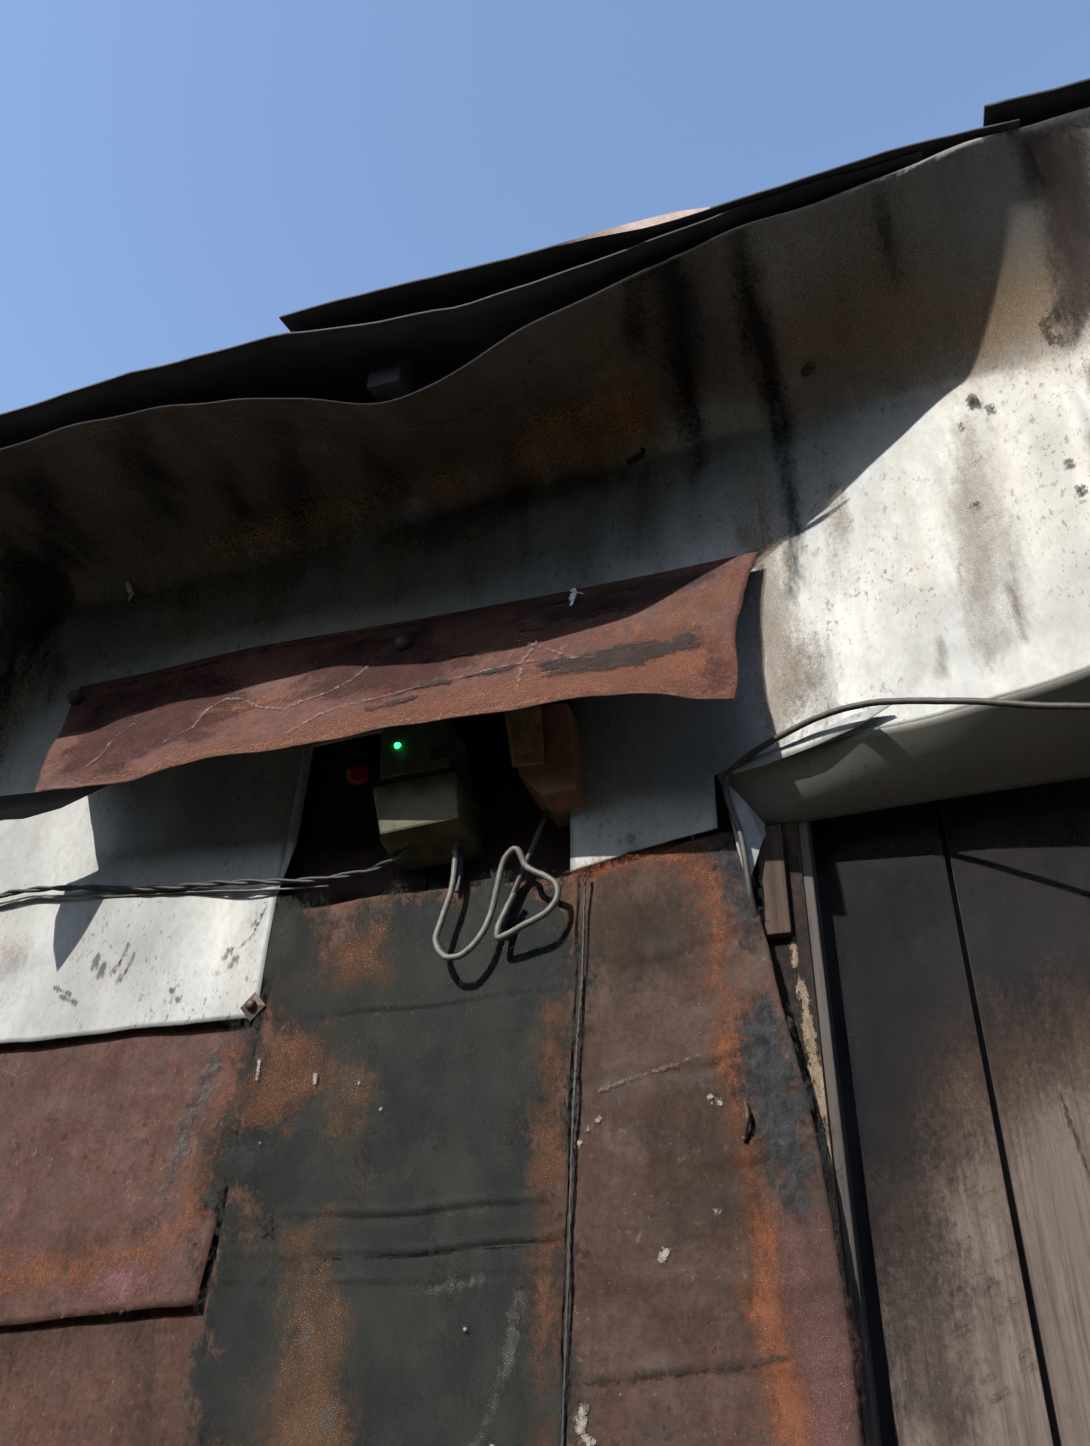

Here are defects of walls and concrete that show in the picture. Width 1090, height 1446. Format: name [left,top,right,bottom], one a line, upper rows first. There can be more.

water stain [798,121,1090,371]
rust [0,993,263,1446]
rust [578,842,821,1446]
water stain [845,961,1090,1419]